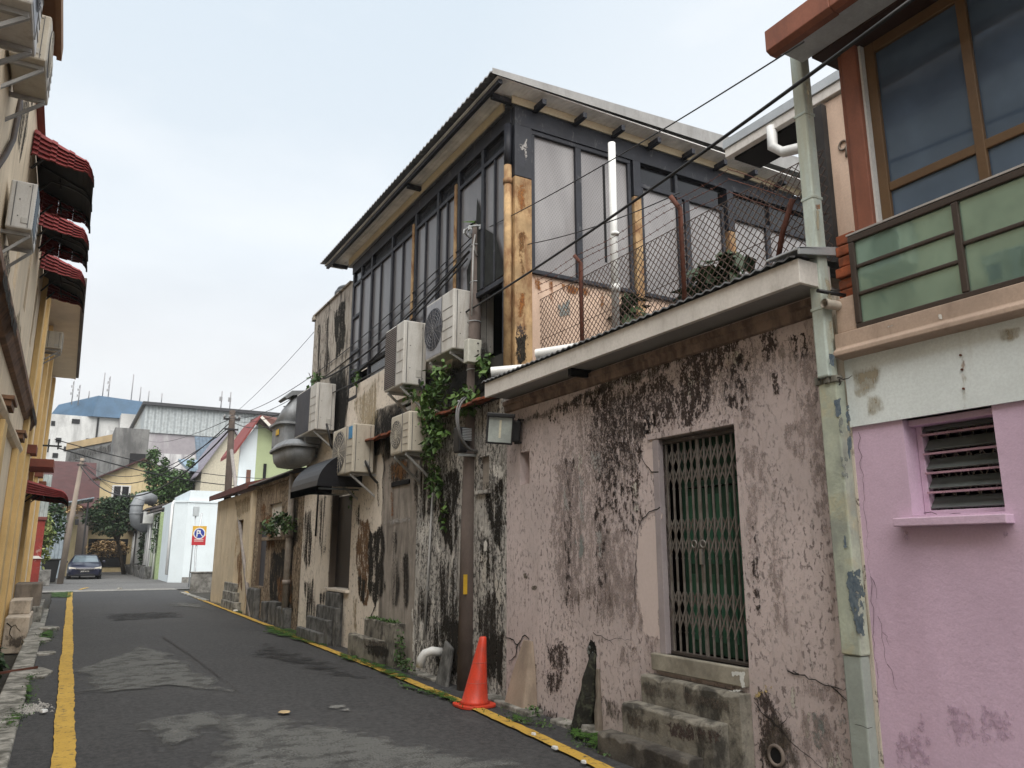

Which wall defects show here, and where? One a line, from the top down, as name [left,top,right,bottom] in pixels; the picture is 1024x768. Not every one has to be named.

leakage [318,300,346,382]
leakage [235,496,326,616]
leakage [377,459,460,680]
leakage [478,589,504,685]
leakage [526,329,831,695]
peeling [846,569,866,636]
crack [787,670,847,701]